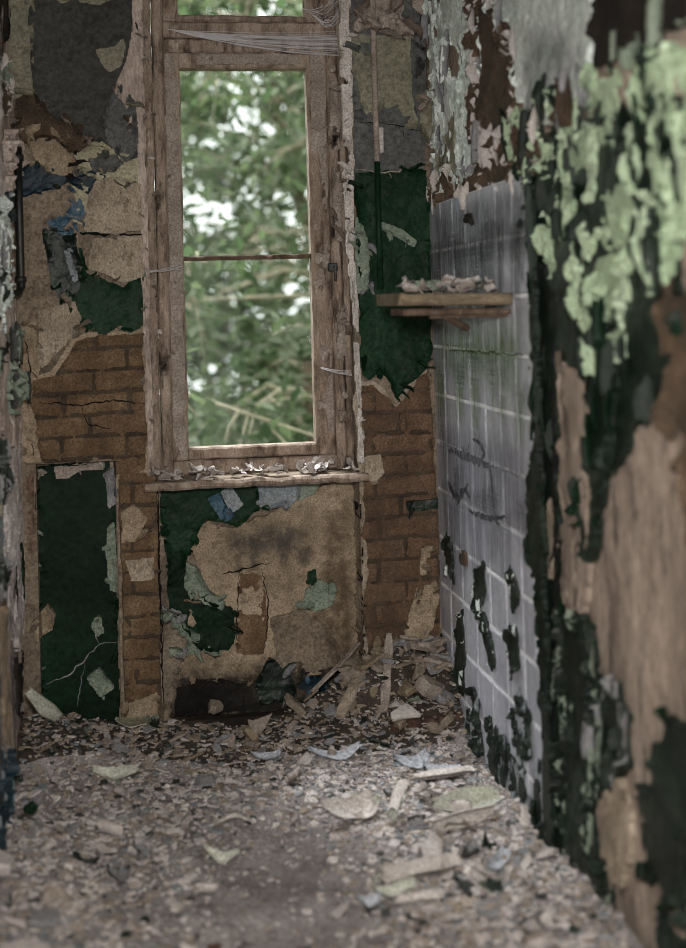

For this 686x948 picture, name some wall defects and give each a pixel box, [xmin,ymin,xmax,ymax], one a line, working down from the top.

crack [47,636,118,705]
peeling [0,0,341,722]
peeling [194,0,686,948]